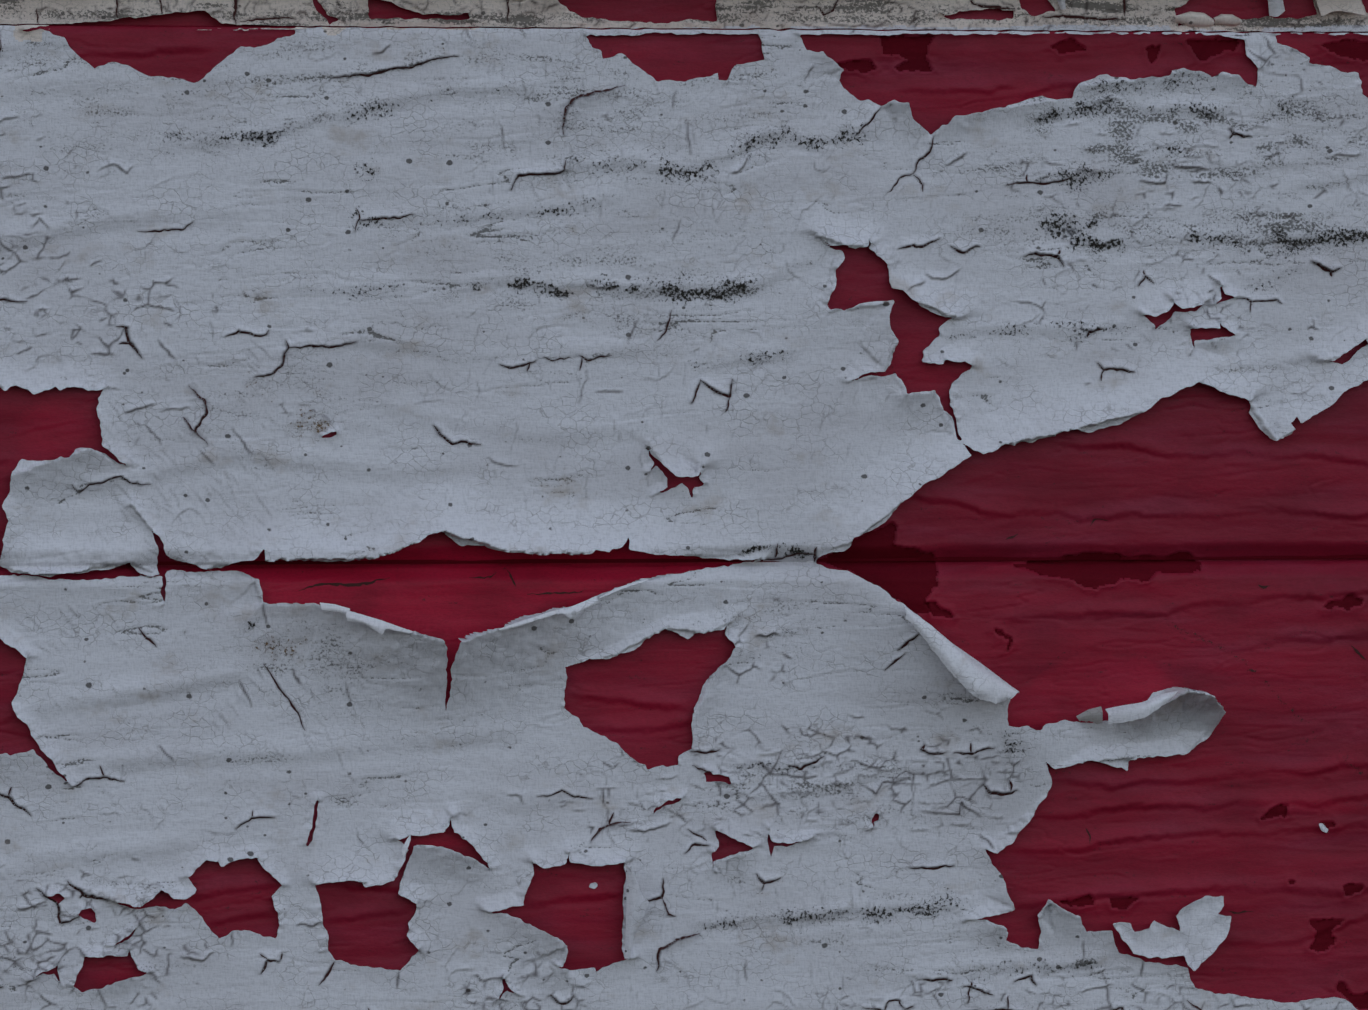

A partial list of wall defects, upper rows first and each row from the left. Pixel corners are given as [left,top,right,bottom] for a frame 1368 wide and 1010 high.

peeling [12,1,307,93]
peeling [546,0,1368,146]
peeling [0,625,83,798]
peeling [0,374,776,723]
peeling [548,613,747,782]
peeling [806,227,1368,1010]
peeling [66,944,159,1004]
peeling [99,806,501,983]
peeling [475,843,649,981]
crack [863,976,1036,1010]